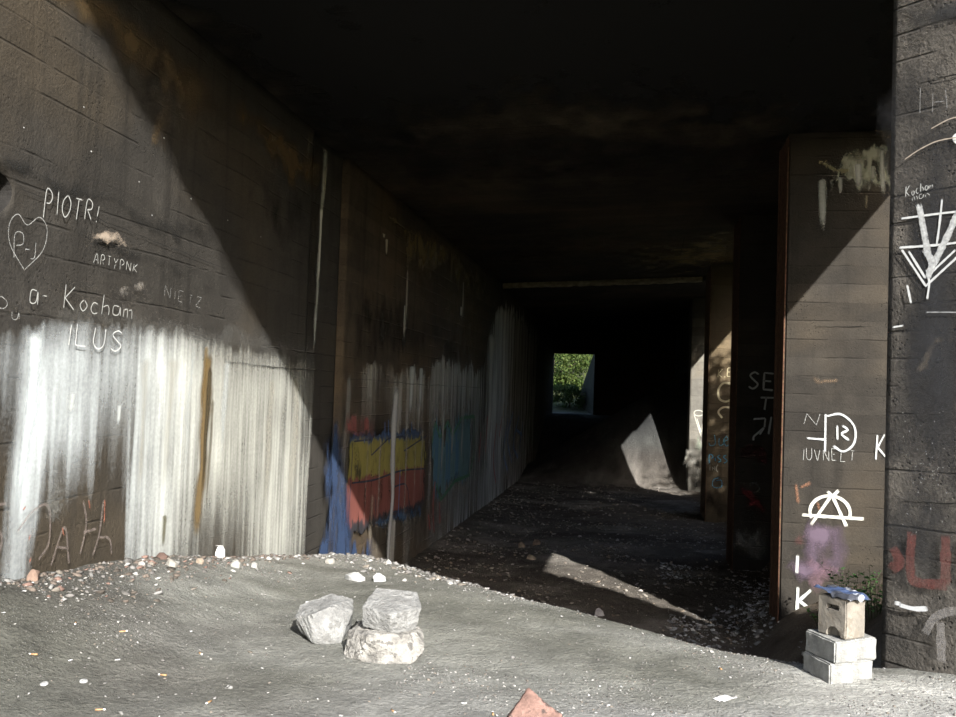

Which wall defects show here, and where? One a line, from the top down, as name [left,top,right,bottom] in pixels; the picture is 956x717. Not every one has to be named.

leakage [237,108,326,338]
rust [194,348,213,529]